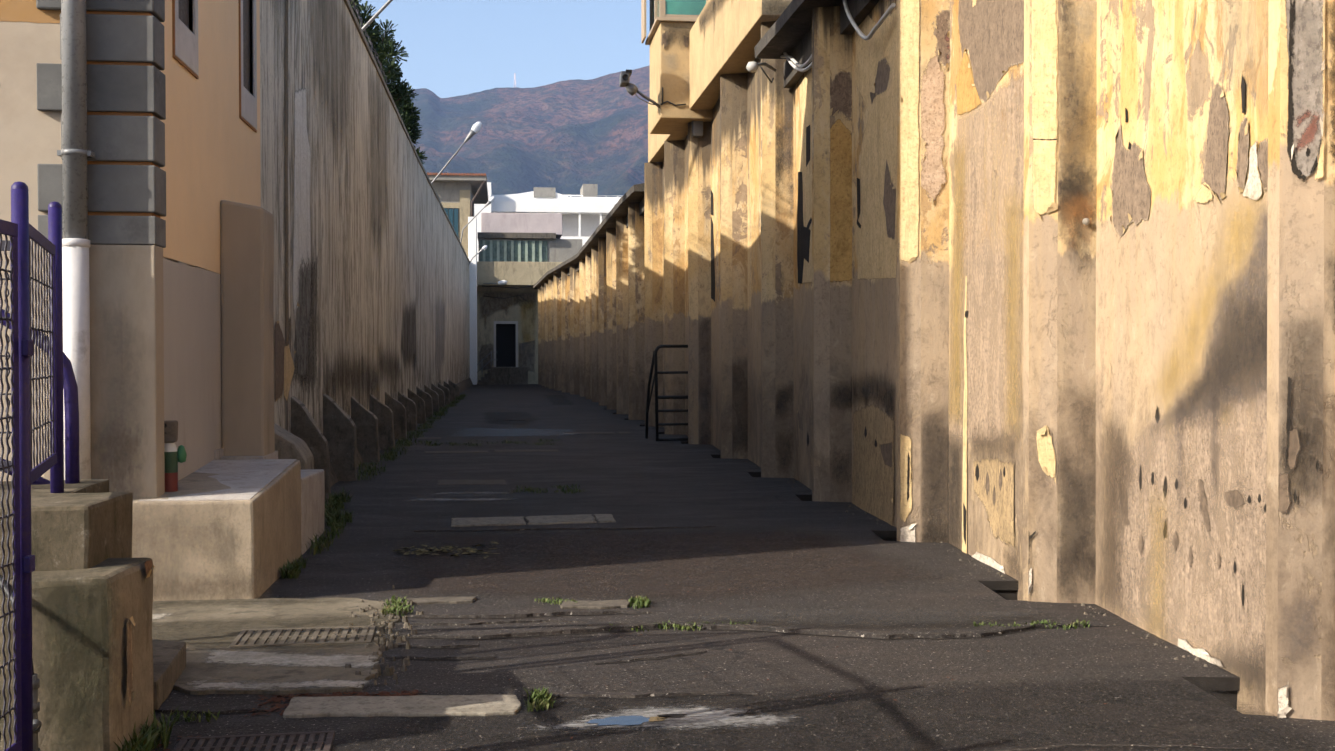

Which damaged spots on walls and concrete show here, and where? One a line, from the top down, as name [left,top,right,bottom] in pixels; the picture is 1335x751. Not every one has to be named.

flaking render [799,73,812,284]
leakage [1061,1,1084,208]
peeling [1110,108,1151,236]
peeling [1193,75,1268,203]
peeling [1285,0,1325,180]
leakage [1327,1,1335,157]
flaking render [830,0,1058,548]
flaking render [971,552,1005,574]
spalling [992,568,1032,600]